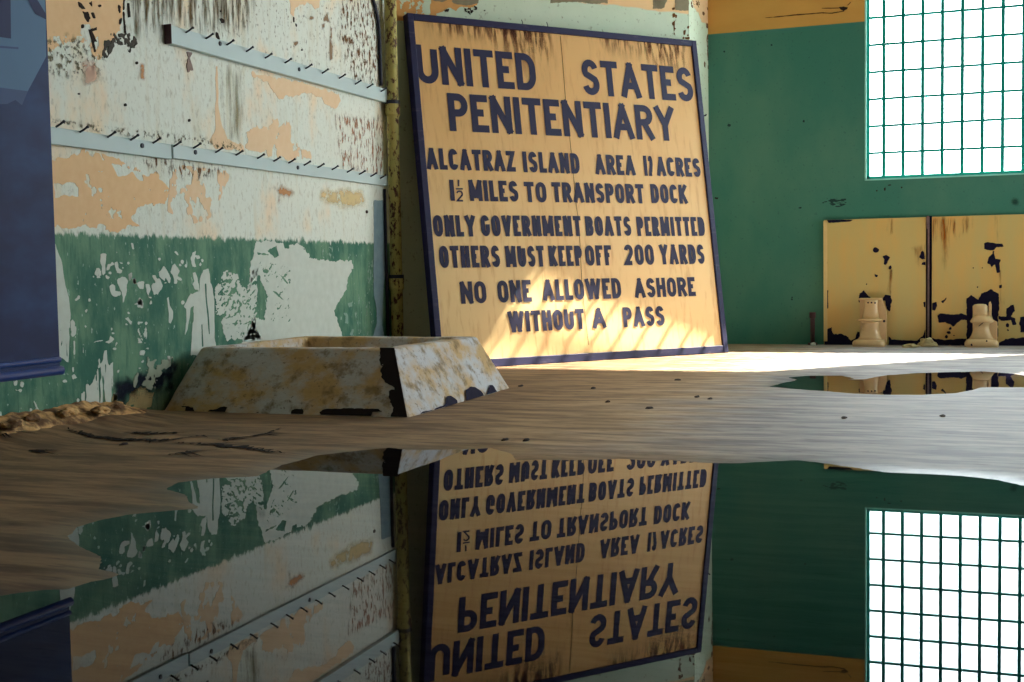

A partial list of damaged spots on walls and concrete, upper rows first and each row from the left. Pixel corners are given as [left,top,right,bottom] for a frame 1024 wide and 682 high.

peeling [46,0,123,60]
damp [102,0,249,58]
peeling [210,66,312,161]
peeling [251,71,341,109]
peeling [52,149,229,233]
peeling [55,200,385,409]